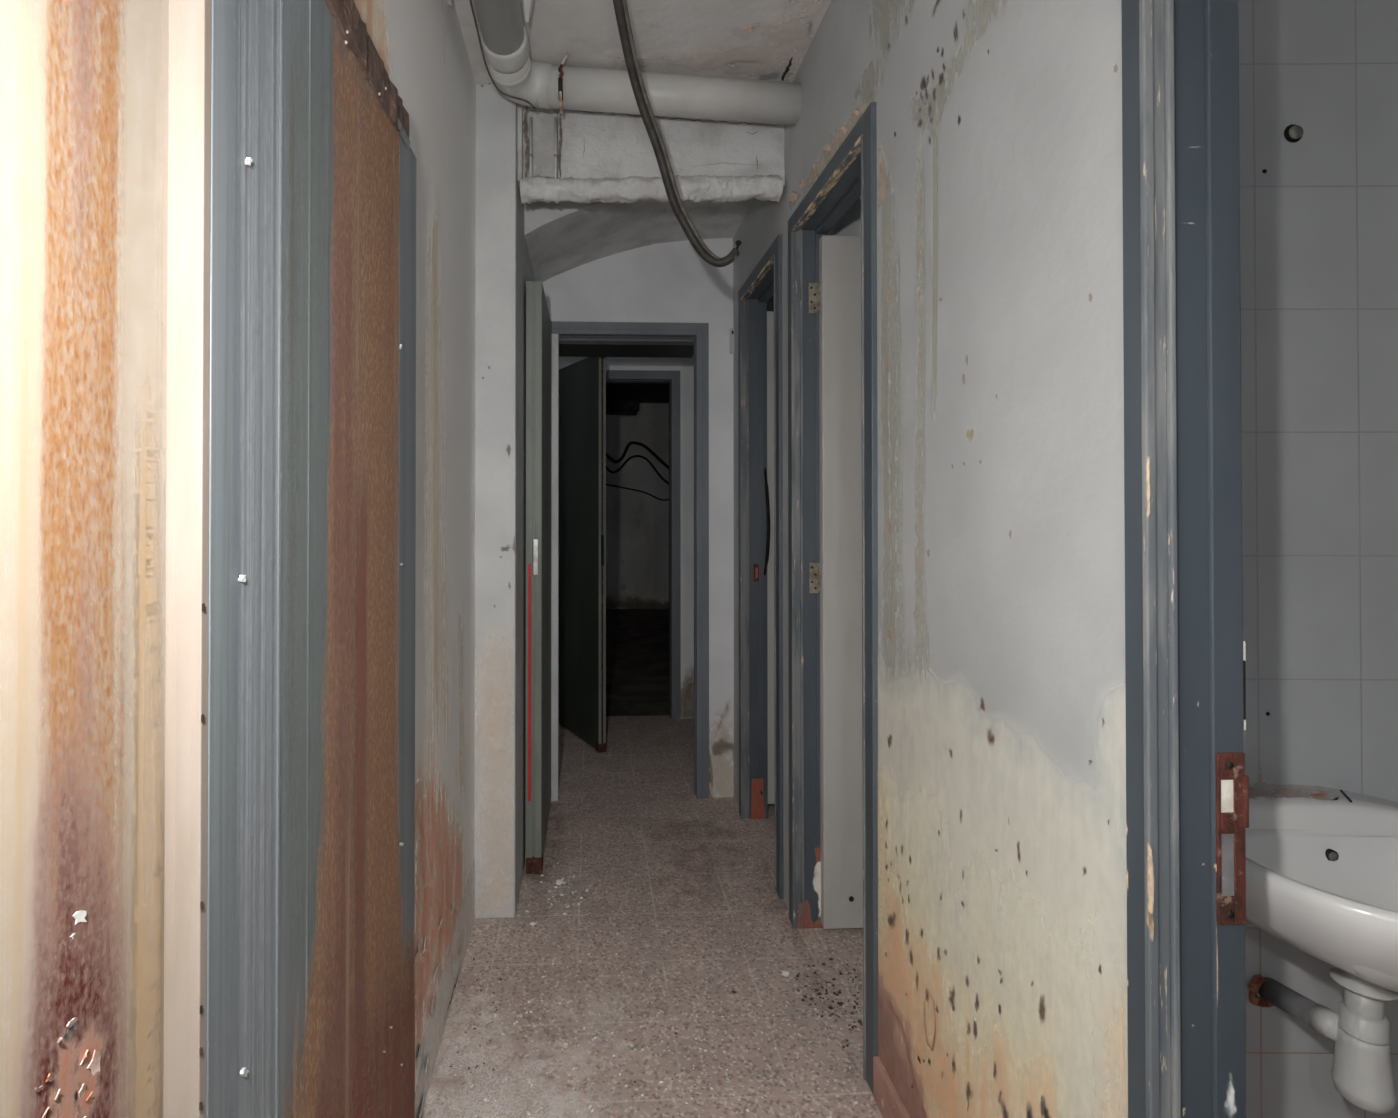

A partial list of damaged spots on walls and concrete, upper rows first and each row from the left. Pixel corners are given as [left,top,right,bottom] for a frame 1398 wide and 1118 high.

peeling [34,1017,102,1118]
peeling [70,910,87,939]
corrosion [0,0,169,1118]
corrosion [289,19,463,1118]
peeling [788,103,867,208]
water stain [878,0,1128,1118]